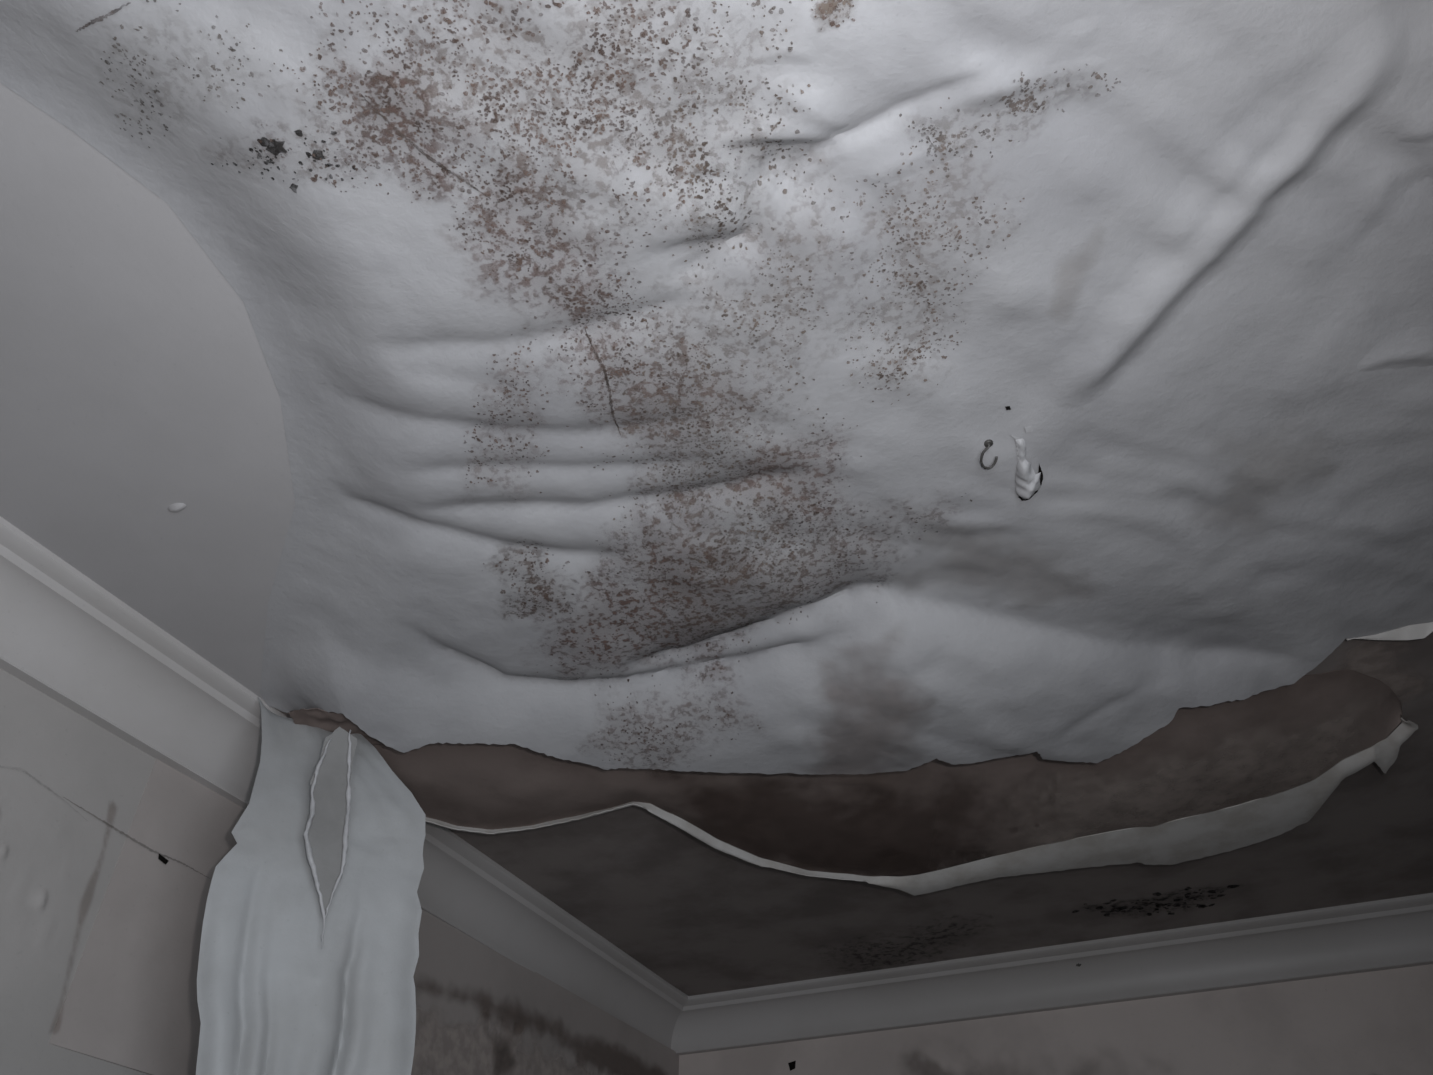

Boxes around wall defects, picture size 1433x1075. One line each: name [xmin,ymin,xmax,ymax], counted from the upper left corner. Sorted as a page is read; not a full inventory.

leakage [99,24,168,148]
leakage [176,0,1118,768]
peeling [447,632,1433,996]